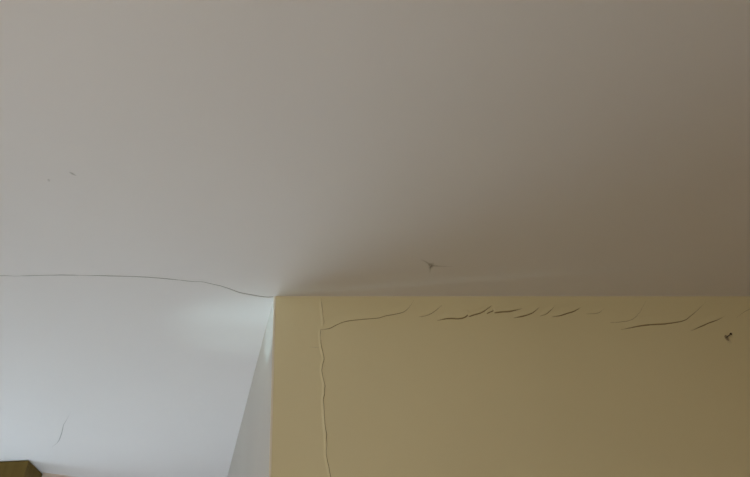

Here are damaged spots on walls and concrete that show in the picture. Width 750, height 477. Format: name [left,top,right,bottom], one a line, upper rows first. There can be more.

crack [75,275,274,332]
crack [317,297,414,477]